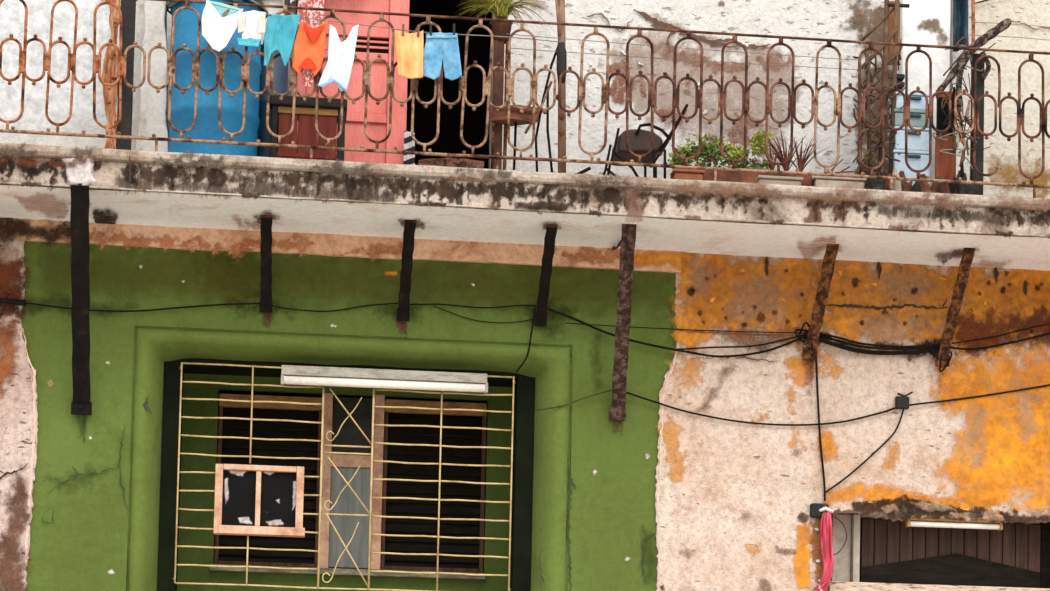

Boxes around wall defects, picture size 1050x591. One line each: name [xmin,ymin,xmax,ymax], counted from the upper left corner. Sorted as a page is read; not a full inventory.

leakage [0,142,103,190]
leakage [116,150,776,219]
leakage [804,155,1050,229]
leakage [0,257,29,318]
leakage [0,217,71,247]
corrosion [937,248,979,263]
peeling [634,251,1050,591]
leakage [0,468,30,591]